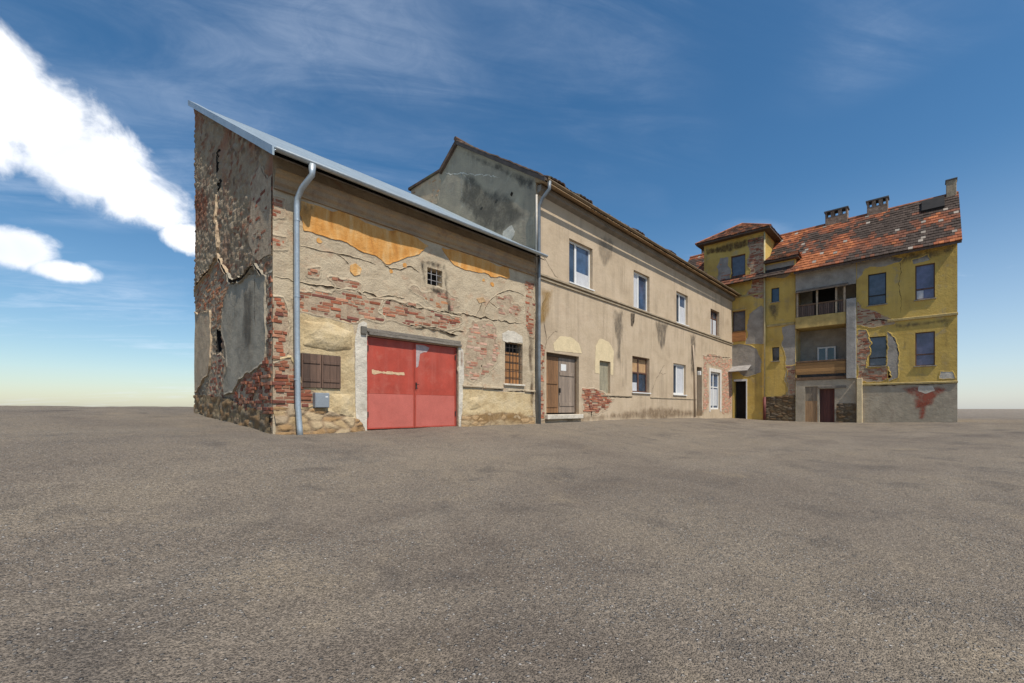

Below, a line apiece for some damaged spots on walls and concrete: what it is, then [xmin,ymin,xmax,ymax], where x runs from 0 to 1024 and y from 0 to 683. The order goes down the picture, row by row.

flaking render [194,166,546,421]
crack [194,194,554,370]
water stain [463,179,517,230]
flaking render [580,387,615,416]
flaking render [703,235,796,415]
flaking render [856,301,900,383]